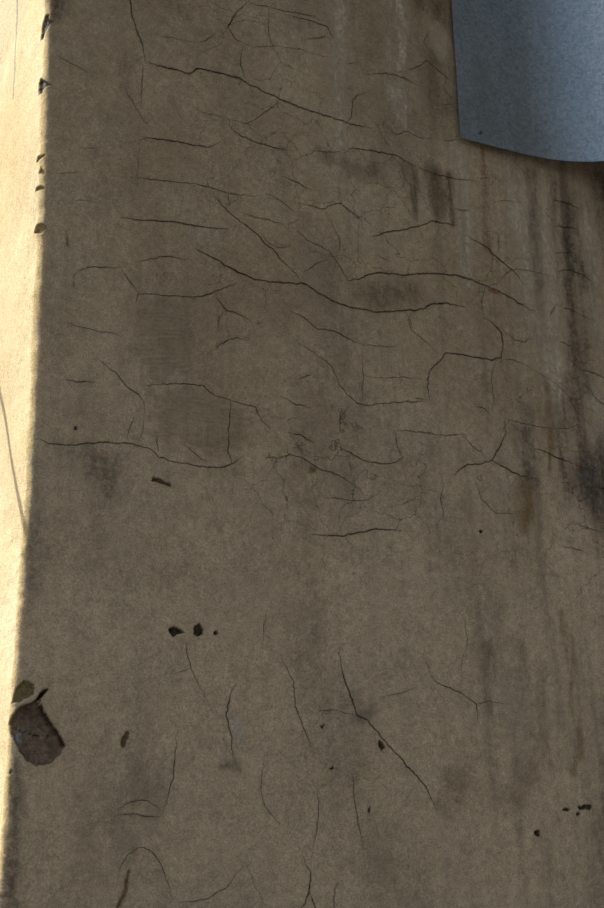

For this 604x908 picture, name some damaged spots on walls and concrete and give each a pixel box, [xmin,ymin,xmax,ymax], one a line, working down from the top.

spalling [42,15,52,40]
crack [126,0,473,181]
damp [508,179,598,423]
crack [41,177,604,521]
crack [312,528,394,537]
spalling [10,681,65,766]
crack [226,686,235,749]
crack [323,653,436,808]
crack [120,743,177,817]
crack [301,858,336,908]